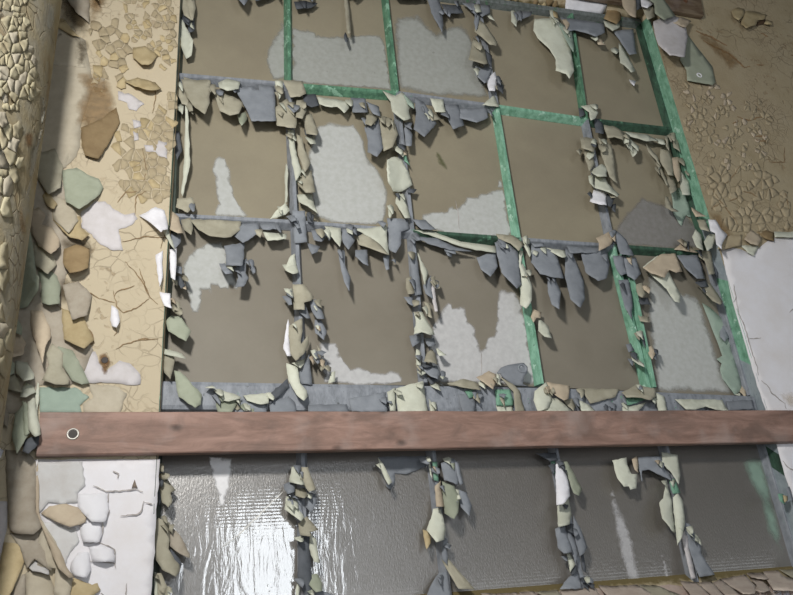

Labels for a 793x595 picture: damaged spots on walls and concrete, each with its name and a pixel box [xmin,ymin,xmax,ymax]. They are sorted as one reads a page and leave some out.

peeling [508,0,691,86]
crack [696,30,762,68]
peeling [731,7,772,28]
flaking render [0,0,525,595]
flaking render [409,104,793,411]
crack [734,286,786,408]
peeling [536,453,595,590]
peeling [612,452,715,579]
flaking render [776,444,793,504]